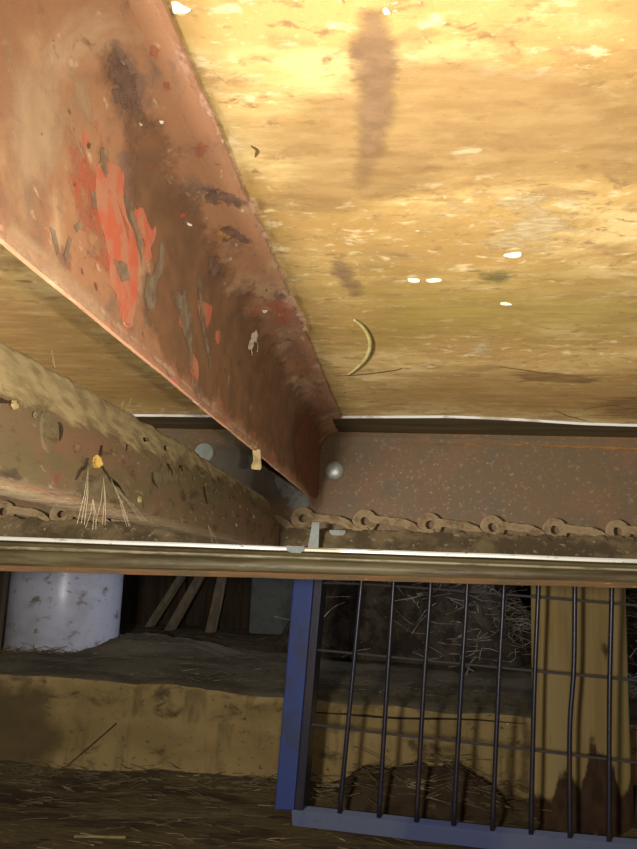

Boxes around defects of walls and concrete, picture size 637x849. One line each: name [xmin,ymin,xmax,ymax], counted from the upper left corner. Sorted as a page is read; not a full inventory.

water stain [271,13,637,200]
peeling [197,188,250,207]
rust [50,221,82,262]
peeling [71,131,156,327]
rust [114,260,130,281]
peeling [198,300,212,328]
rust [124,121,323,505]